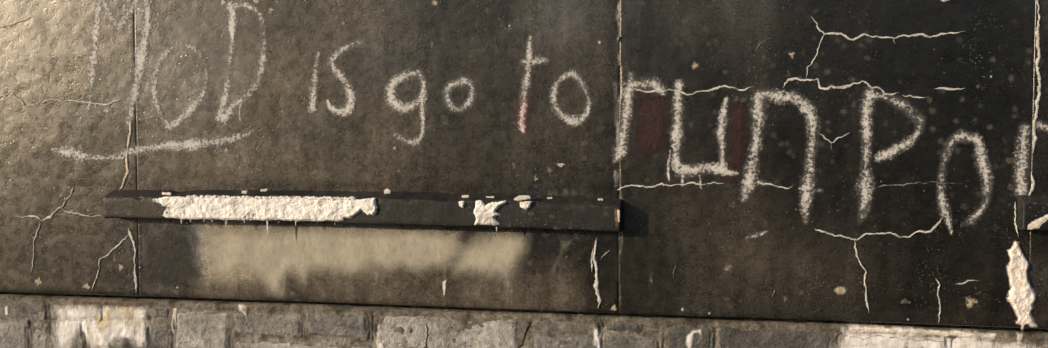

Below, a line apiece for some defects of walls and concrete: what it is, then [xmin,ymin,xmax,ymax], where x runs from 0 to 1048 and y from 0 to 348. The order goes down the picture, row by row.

crack [0,16,34,28]
crack [0,93,131,190]
crack [633,85,750,95]
crack [784,18,964,98]
crack [1014,0,1041,233]
crack [617,182,722,190]
crack [19,184,103,274]
crack [92,229,138,292]
damp [148,195,523,295]
crack [816,215,945,311]
crack [845,279,1044,348]